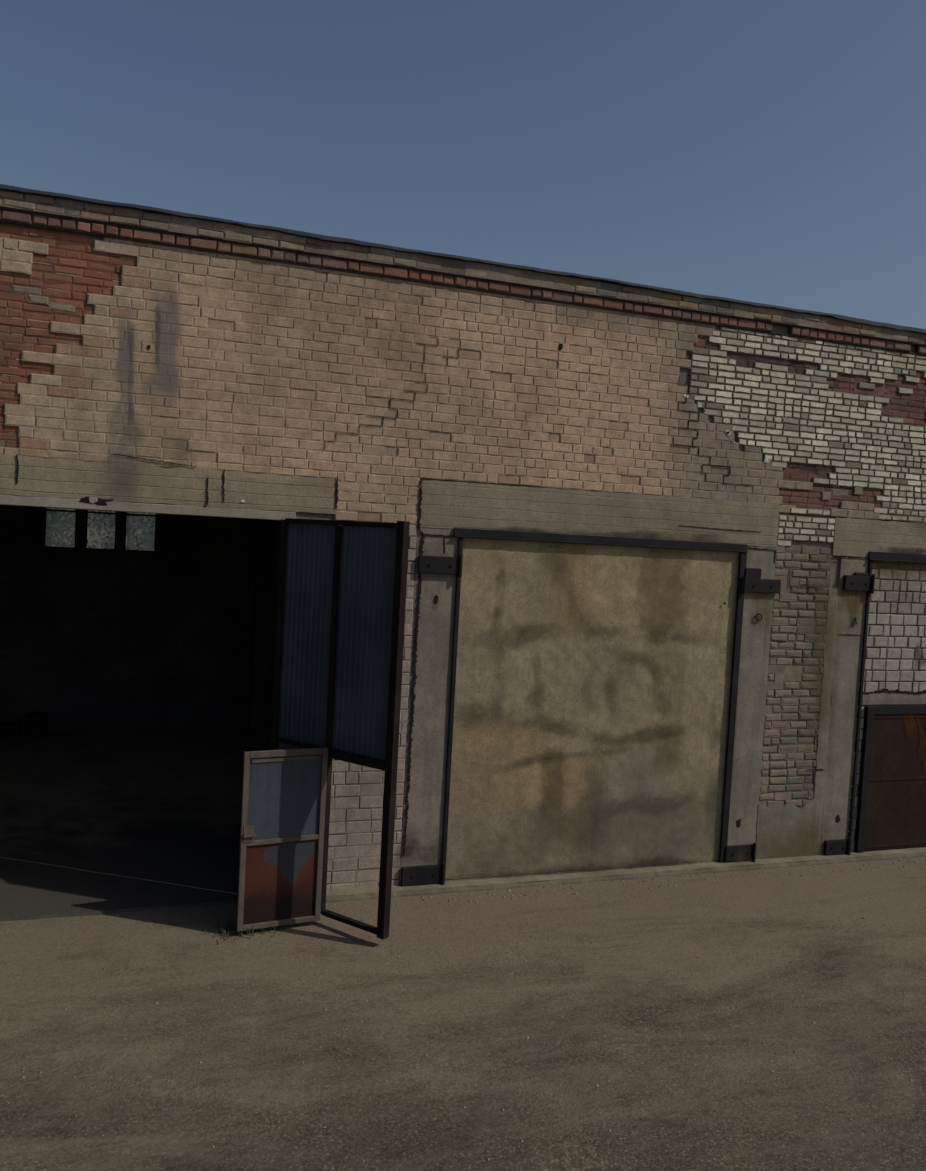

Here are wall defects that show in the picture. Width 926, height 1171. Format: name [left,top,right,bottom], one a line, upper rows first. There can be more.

spalling [0,224,137,448]
crack [673,376,753,494]
peeling [683,327,926,546]